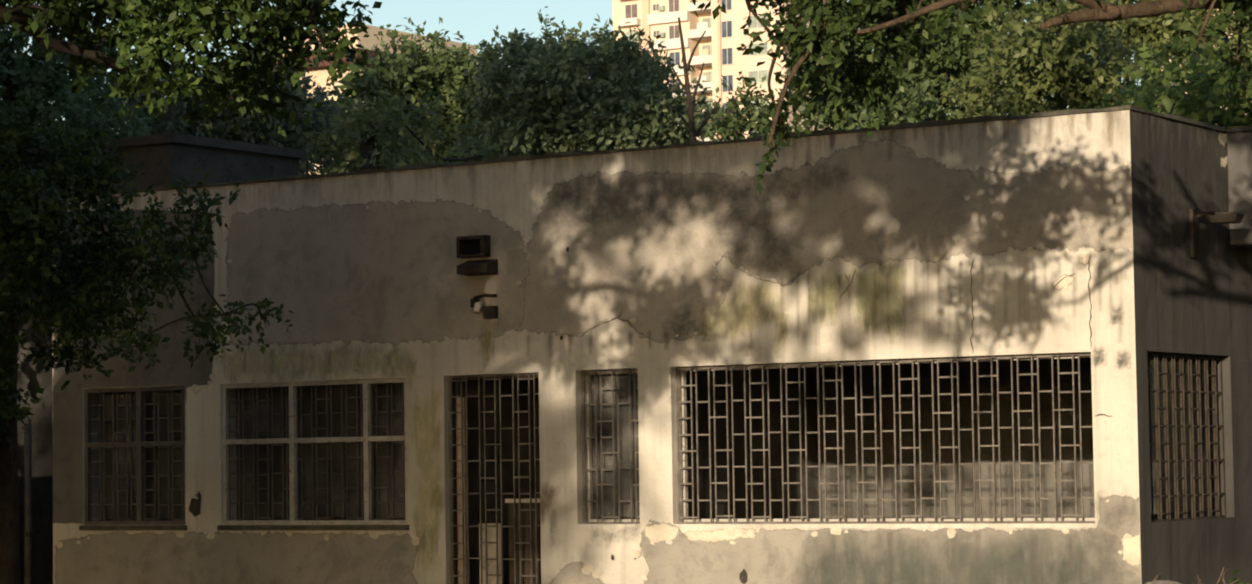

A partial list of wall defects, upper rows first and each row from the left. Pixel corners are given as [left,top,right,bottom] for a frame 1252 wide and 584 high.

peeling [52,139,1133,523]
crack [968,260,976,351]
peeling [550,562,604,584]
peeling [631,490,1141,584]